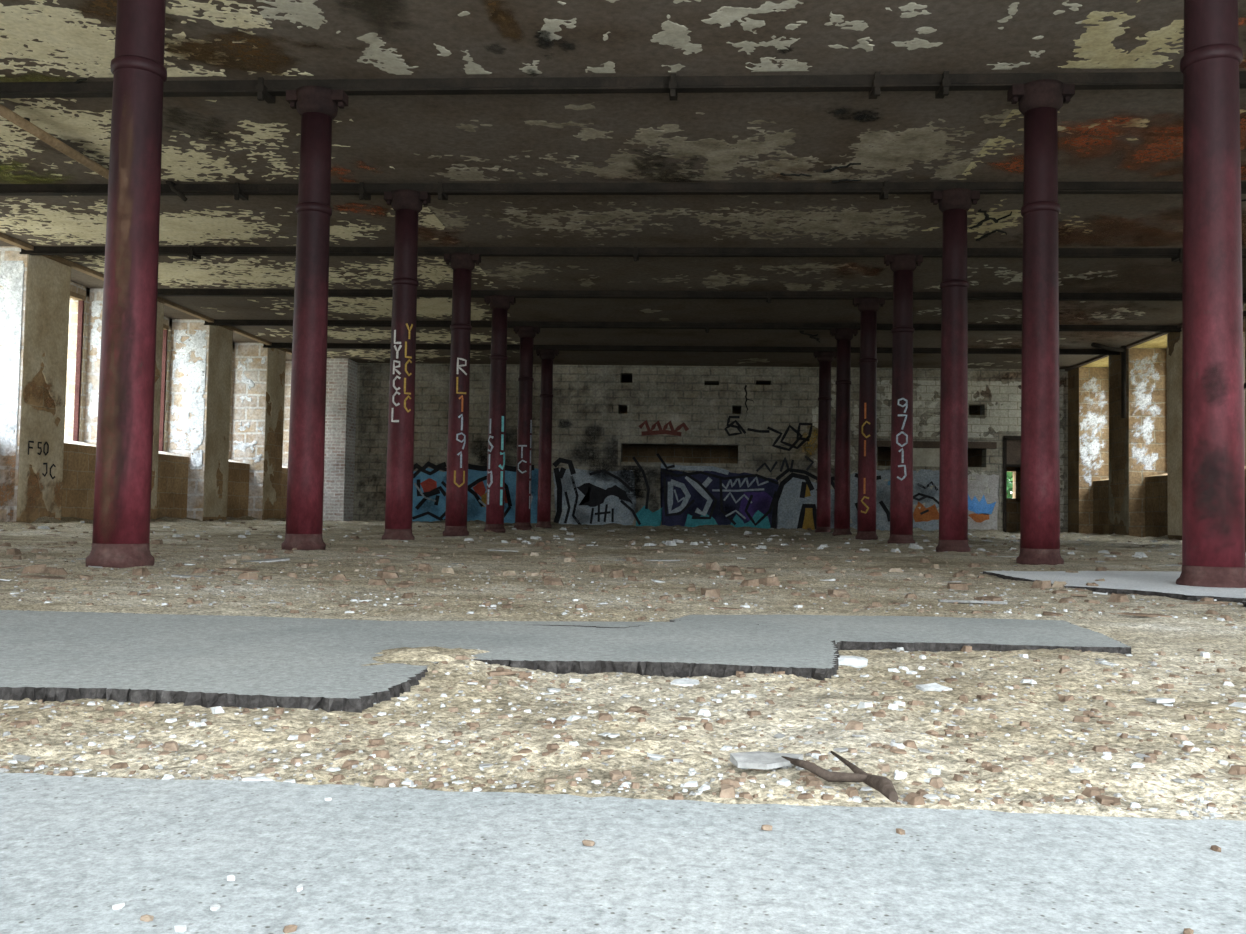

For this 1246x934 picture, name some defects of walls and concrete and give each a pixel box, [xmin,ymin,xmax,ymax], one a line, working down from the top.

peeling [0,0,116,78]
peeling [164,0,341,77]
peeling [357,33,418,75]
peeling [433,43,491,74]
peeling [538,18,577,41]
peeling [651,0,812,72]
peeling [824,11,875,52]
peeling [886,2,943,50]
peeling [987,36,1045,69]
peeling [1053,0,1184,69]
peeling [0,98,112,177]
peeling [161,120,301,182]